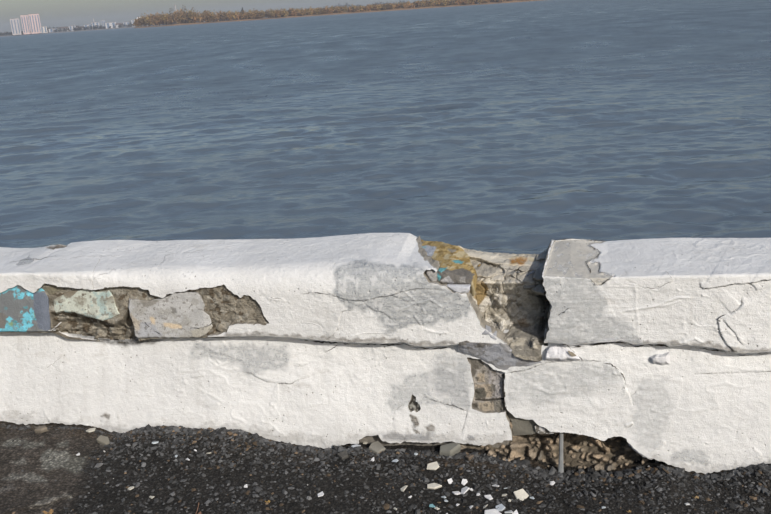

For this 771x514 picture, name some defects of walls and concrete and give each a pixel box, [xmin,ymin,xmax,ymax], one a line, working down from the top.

spalling [0,284,269,343]
crack [304,323,456,351]
leakage [335,261,470,328]
spalling [416,236,612,362]
crack [700,280,771,374]
spalling [408,395,421,412]
spalling [459,340,512,434]
crack [503,342,674,411]